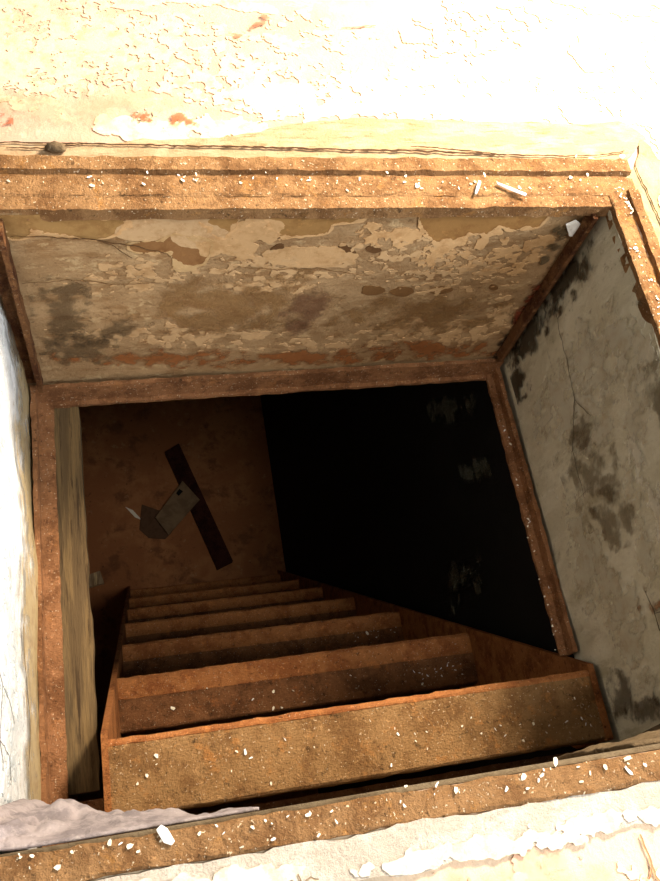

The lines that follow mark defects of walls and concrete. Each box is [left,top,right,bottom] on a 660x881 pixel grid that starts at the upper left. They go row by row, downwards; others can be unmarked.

peeling [0,0,562,142]
peeling [566,220,580,237]
leakage [31,284,135,364]
leakage [160,275,493,337]
leakage [491,240,593,405]
leakage [533,318,660,721]
spalling [349,806,660,877]